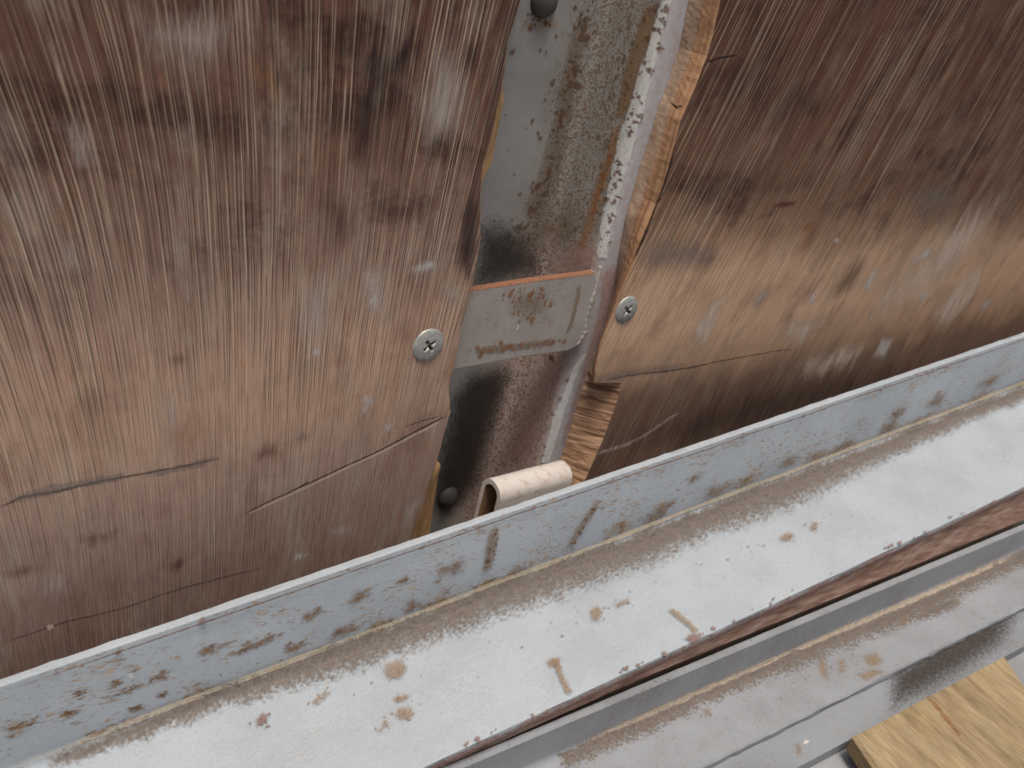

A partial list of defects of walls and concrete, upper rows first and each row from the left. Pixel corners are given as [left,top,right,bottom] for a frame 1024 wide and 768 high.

rust [505,0,654,250]
rust [470,270,595,362]
crack [248,418,442,514]
rust [34,340,1024,768]